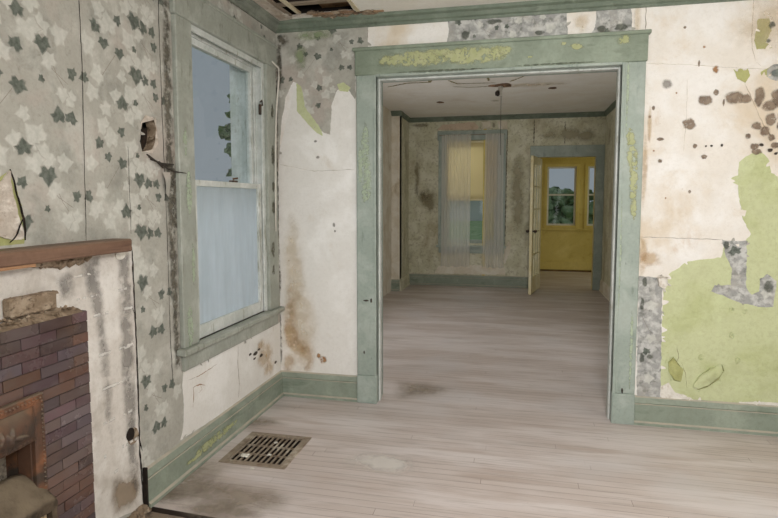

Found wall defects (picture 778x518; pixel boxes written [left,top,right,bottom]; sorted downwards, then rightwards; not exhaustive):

water stain [276,36,286,96]
spalling [379,46,511,73]
water stain [699,88,778,155]
spalling [0,171,24,240]
flaking render [0,250,143,518]